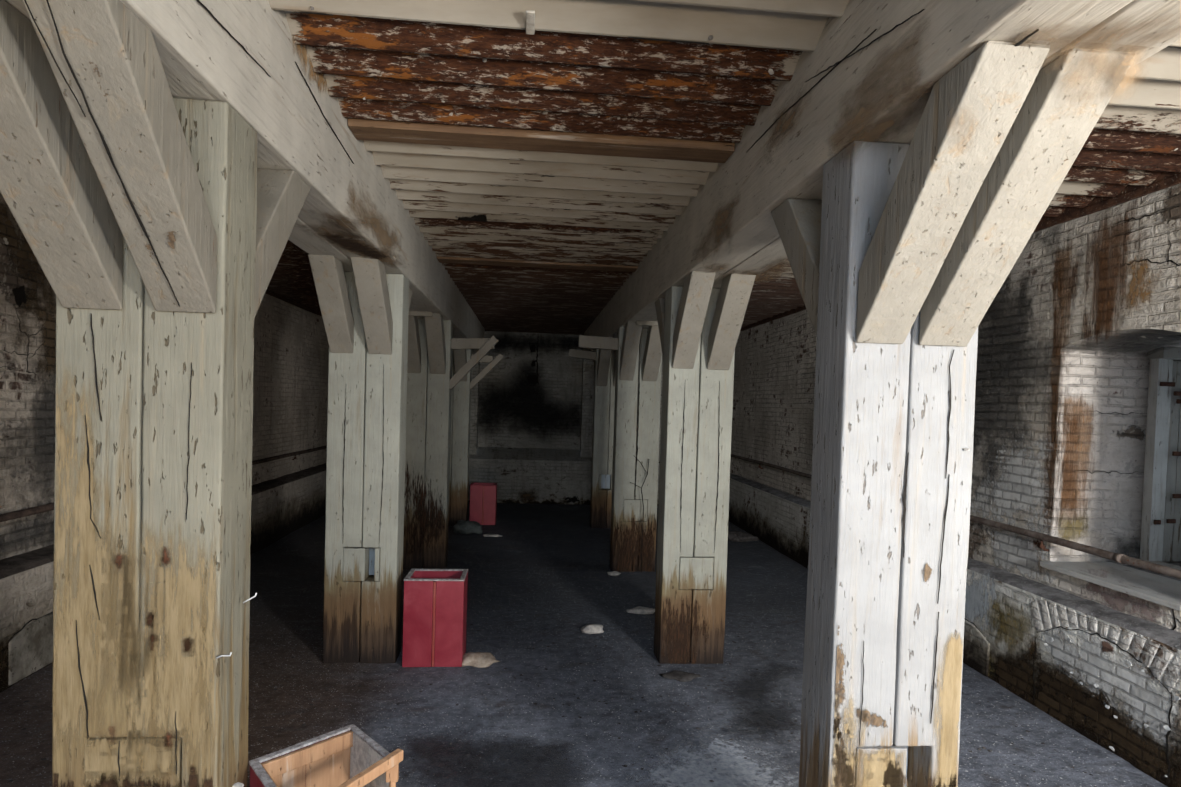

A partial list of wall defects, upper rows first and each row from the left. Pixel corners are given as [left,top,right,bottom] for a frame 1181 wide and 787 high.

crack [24,0,180,307]
rust [1042,113,1181,217]
peeling [1160,184,1181,227]
water stain [0,636,15,689]
water stain [0,204,56,557]
water stain [411,738,580,787]
water stain [965,272,1181,787]
rust [1044,211,1151,527]